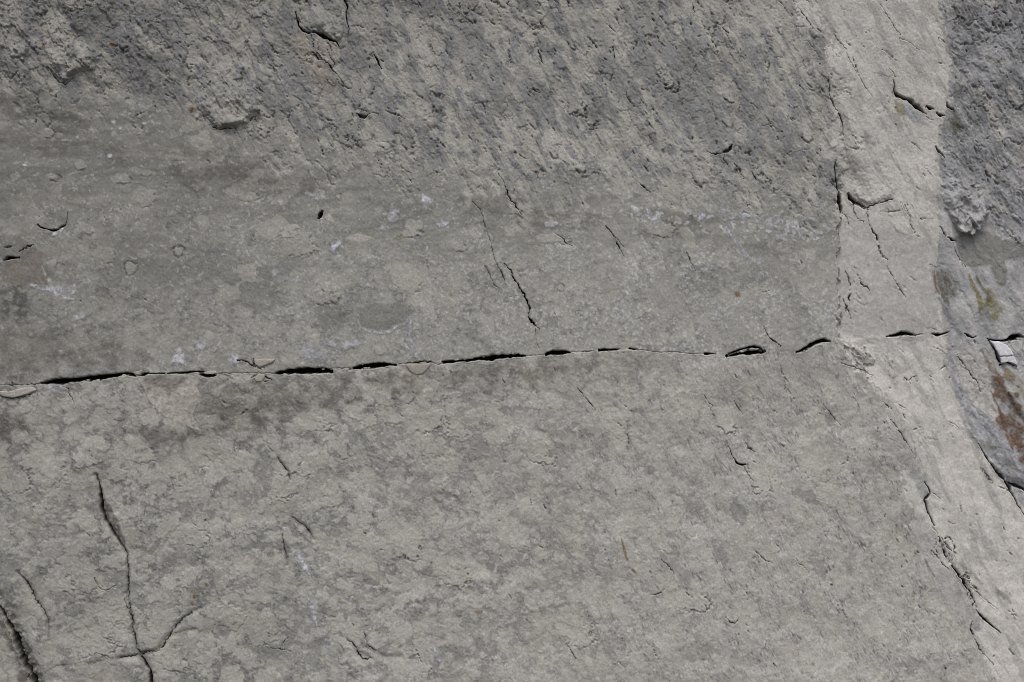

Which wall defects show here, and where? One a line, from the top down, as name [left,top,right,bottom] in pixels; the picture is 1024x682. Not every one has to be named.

crack [934,146,946,158]
crack [833,160,966,297]
crack [0,201,873,403]
crack [822,375,917,458]
crack [886,330,1023,392]
crack [949,421,1024,517]
corrosion [982,349,1024,462]
crack [0,572,50,682]
crack [93,475,193,682]
crack [922,482,1001,666]